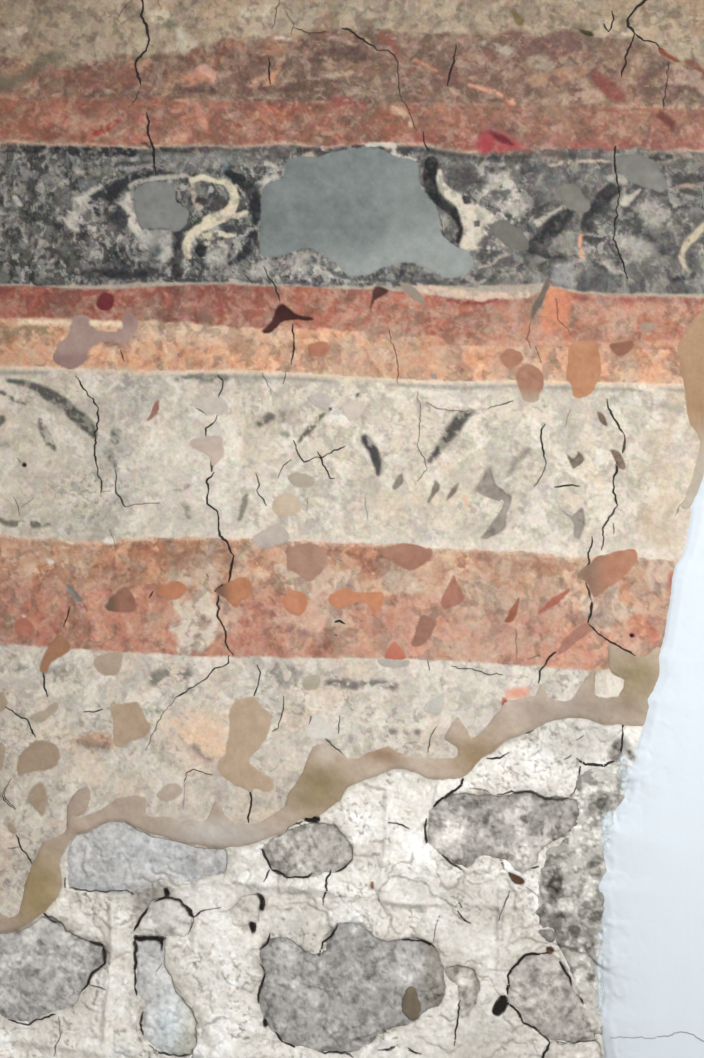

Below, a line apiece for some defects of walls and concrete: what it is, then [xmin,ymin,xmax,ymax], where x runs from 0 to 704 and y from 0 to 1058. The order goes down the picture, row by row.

crack [134,0,150,85]
crack [603,0,669,108]
crack [146,112,156,175]
crack [613,146,628,279]
crack [196,375,224,436]
crack [282,440,346,479]
crack [534,424,580,488]
crack [585,399,636,656]
crack [150,463,234,742]
flaking render [0,644,643,931]